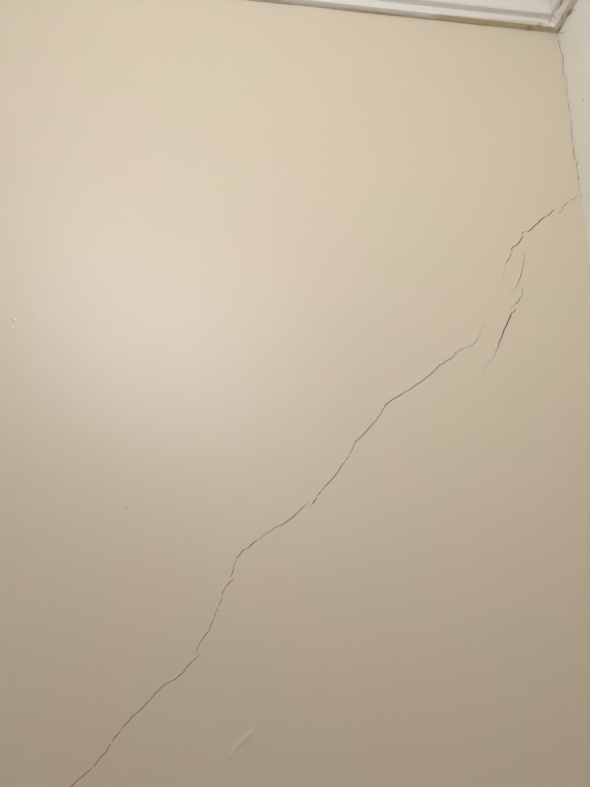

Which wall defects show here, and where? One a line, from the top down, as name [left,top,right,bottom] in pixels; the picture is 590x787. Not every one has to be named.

crack [474,1,582,385]
crack [70,322,487,787]